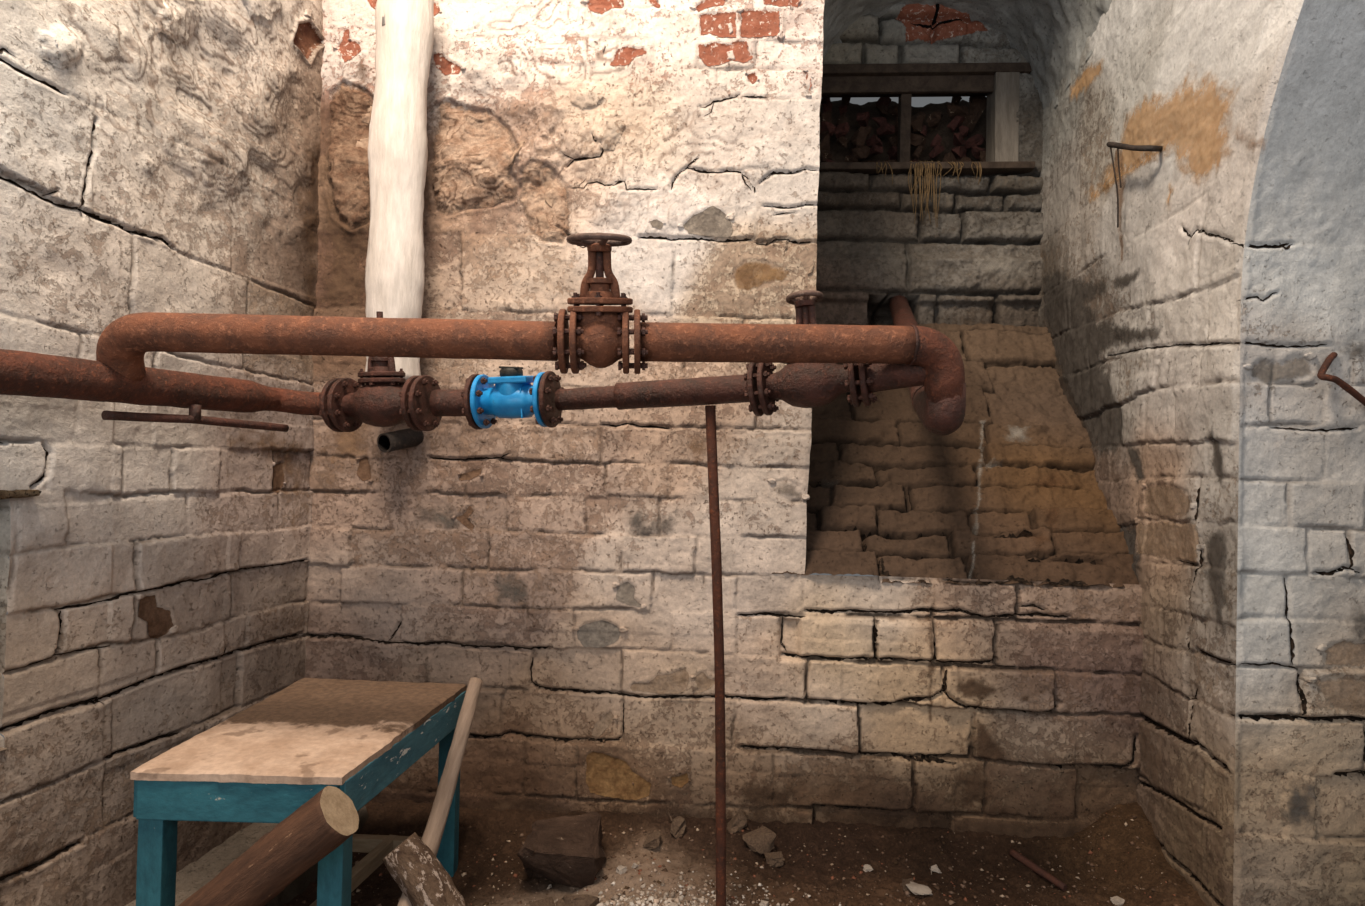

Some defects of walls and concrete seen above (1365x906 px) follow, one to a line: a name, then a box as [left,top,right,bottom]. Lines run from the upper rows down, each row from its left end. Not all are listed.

spalling [580,0,624,14]
crack [0,48,65,95]
spalling [602,45,647,66]
spalling [689,0,800,83]
crack [0,122,171,249]
crack [564,134,814,250]
rust [1090,80,1228,259]
leakage [1114,271,1138,287]
leakage [1107,328,1158,344]
leakage [1128,448,1144,482]
peeling [132,593,179,639]
crack [1179,477,1365,776]